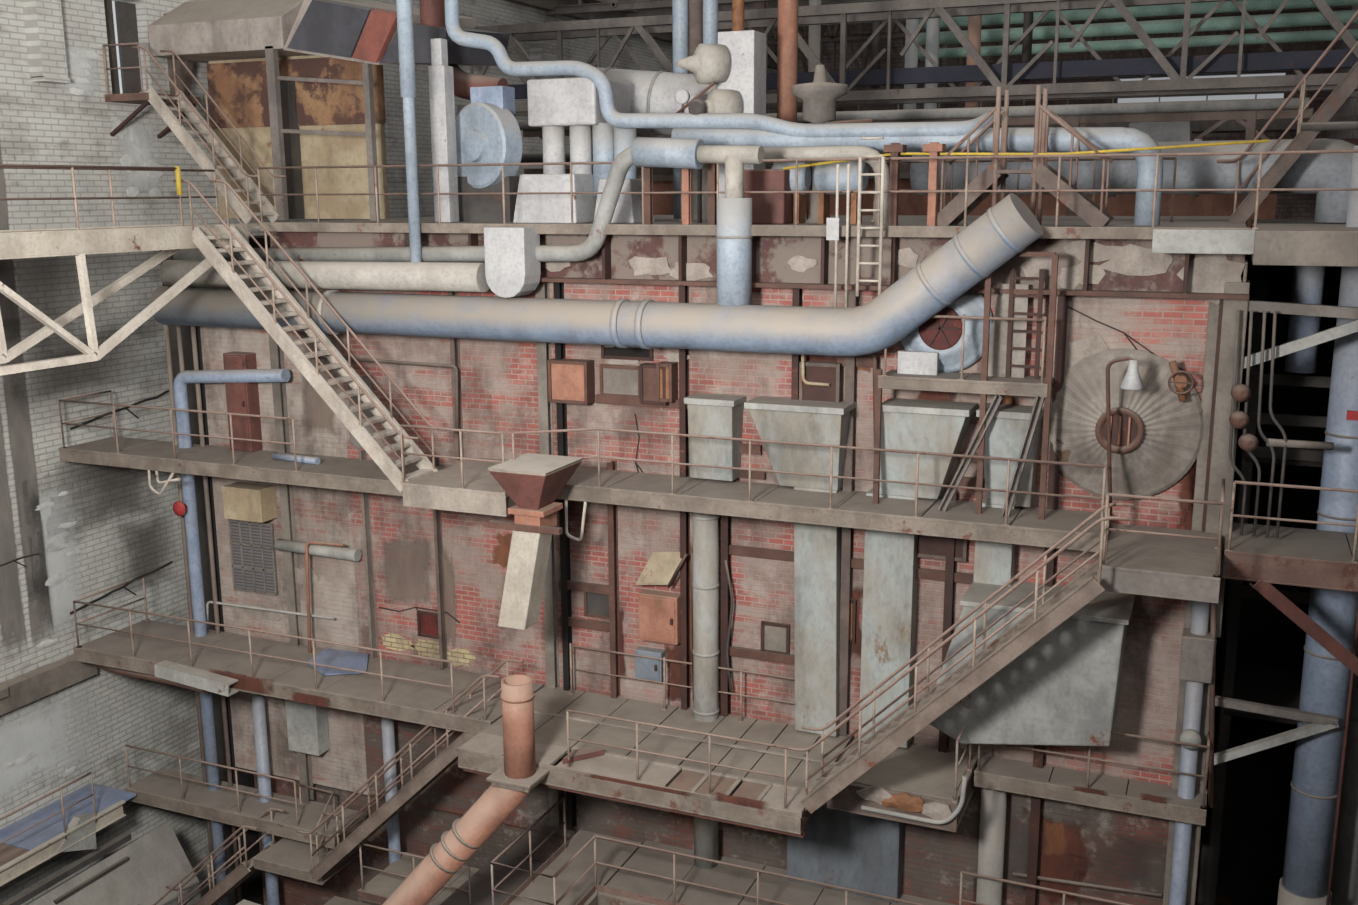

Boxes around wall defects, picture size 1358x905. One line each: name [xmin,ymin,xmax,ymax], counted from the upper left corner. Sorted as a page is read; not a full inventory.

corrosion [206,57,386,128]
flaking render [540,262,571,272]
flaking render [628,256,714,281]
flaking render [788,255,818,273]
flaking render [898,248,930,268]
corrosion [1022,815,1088,903]